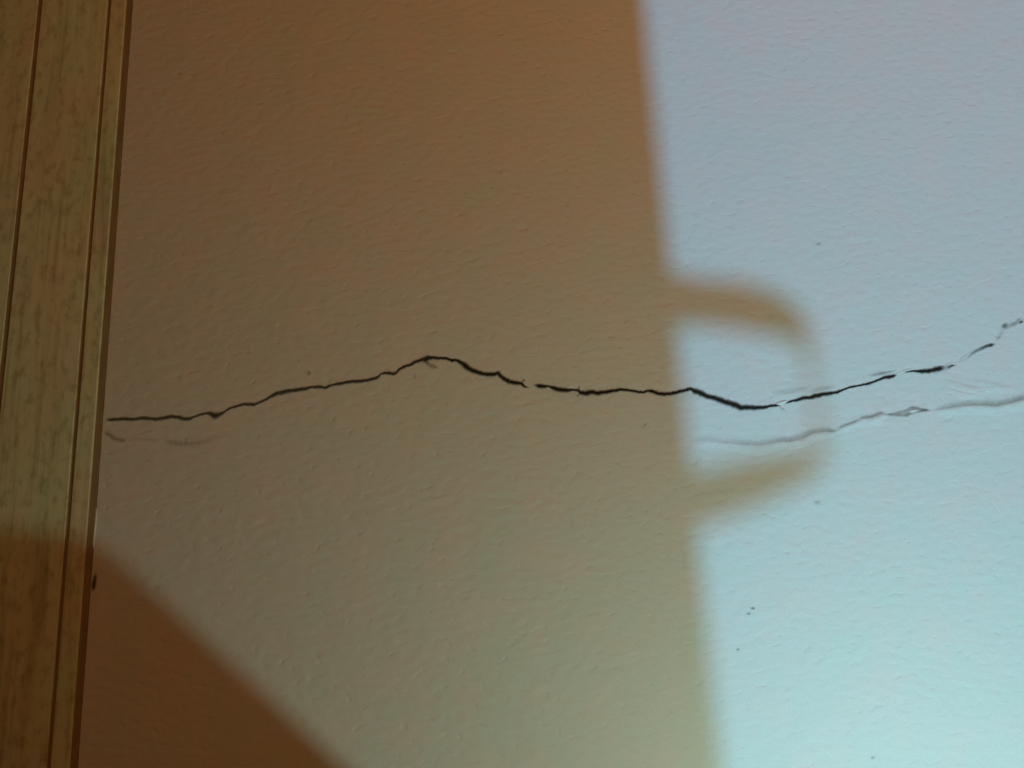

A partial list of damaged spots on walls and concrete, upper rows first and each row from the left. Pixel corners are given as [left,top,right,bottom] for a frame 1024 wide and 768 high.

crack [108,344,993,441]